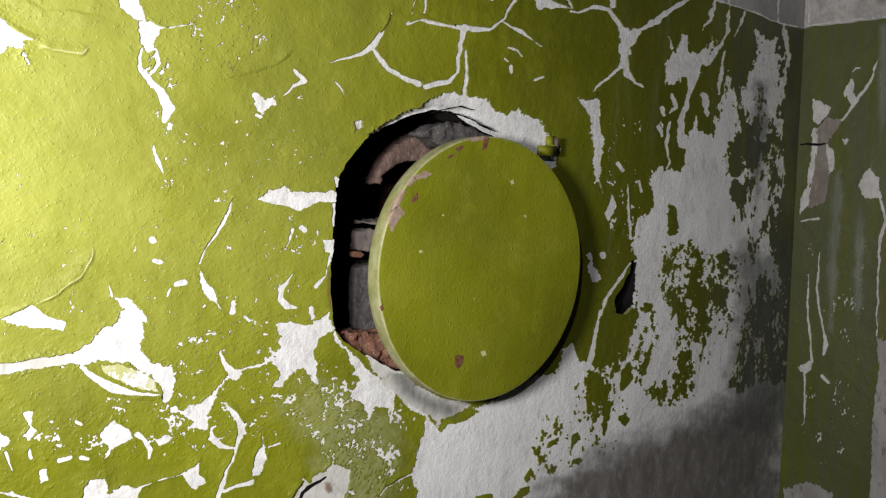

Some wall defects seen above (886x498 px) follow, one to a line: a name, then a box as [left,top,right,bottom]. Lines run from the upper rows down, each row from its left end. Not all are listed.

peeling [0,18,39,63]
crack [329,0,689,132]
crack [717,9,746,95]
crack [776,0,791,61]
peeling [800,58,879,222]
peeling [251,29,833,498]
peeling [0,300,66,331]
peeling [66,285,262,428]
peeling [38,469,48,483]
peeling [56,455,89,463]
peeling [100,420,171,459]
peeling [82,462,206,498]